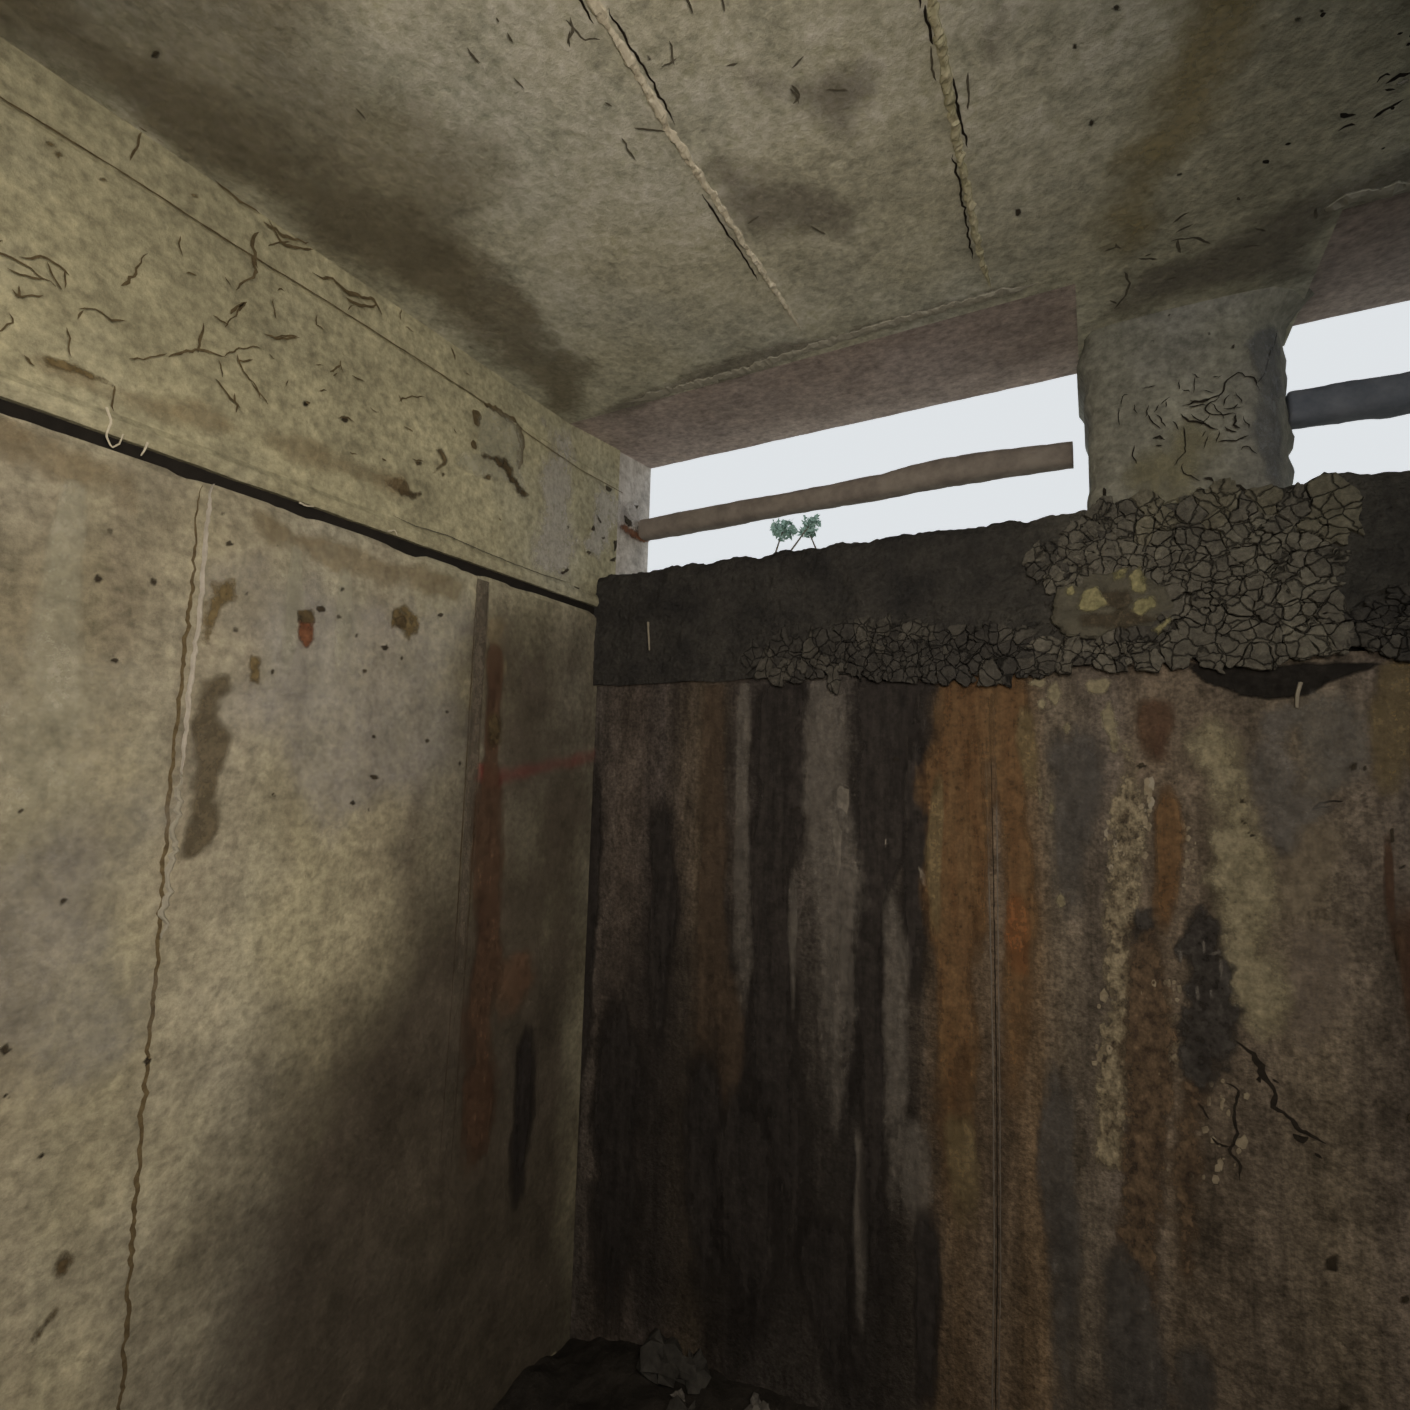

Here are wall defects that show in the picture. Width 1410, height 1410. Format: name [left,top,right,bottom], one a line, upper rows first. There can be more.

crack [579,0,675,125]
crack [919,0,933,45]
crack [0,96,623,493]
crack [702,194,758,281]
crack [951,78,973,259]
peeling [471,401,527,497]
crack [741,333,1410,695]
rust [917,676,994,1208]
crack [1198,1040,1326,1178]